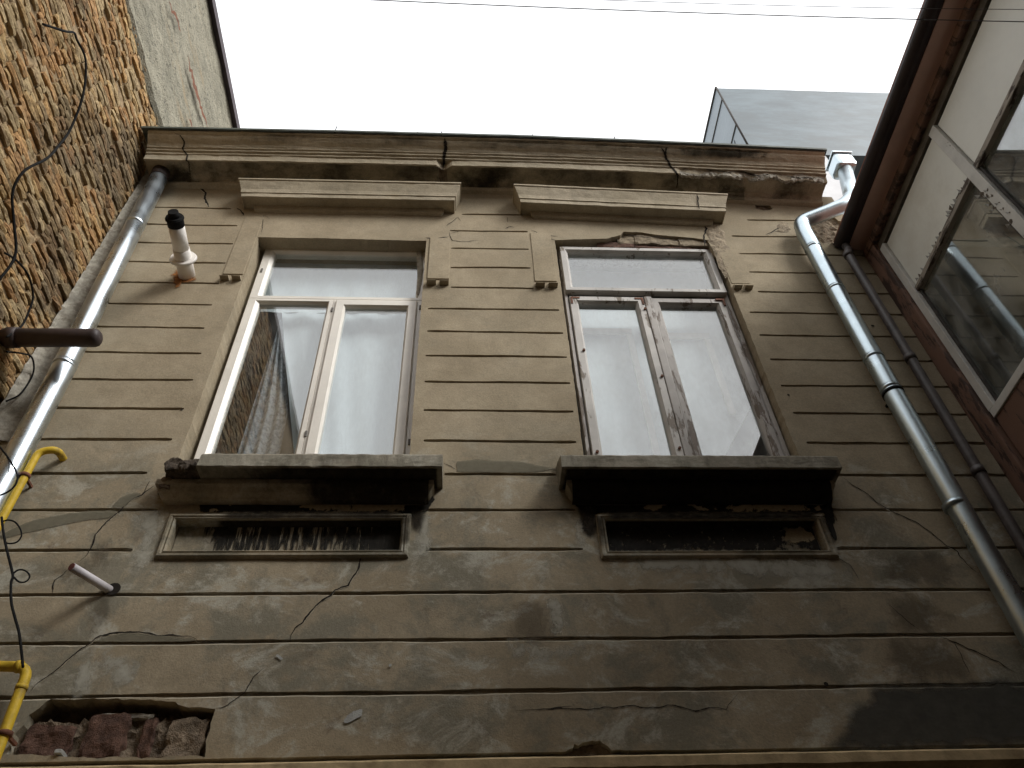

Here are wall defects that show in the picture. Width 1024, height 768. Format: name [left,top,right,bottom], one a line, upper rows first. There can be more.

crack [175,56,209,207]
crack [441,138,449,167]
crack [661,147,708,245]
spalling [680,168,825,185]
spalling [596,224,729,278]
crack [52,481,152,594]
crack [840,476,980,576]
crack [289,558,361,644]
crack [32,631,215,689]
crack [519,695,737,712]
spalling [13,712,212,766]